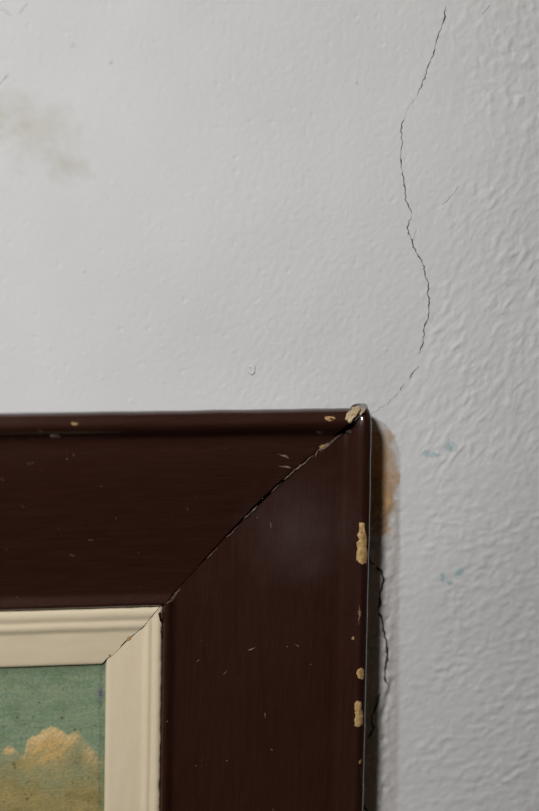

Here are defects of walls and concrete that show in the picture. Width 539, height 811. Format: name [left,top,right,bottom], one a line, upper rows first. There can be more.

crack [417,7,446,95]
crack [400,119,430,391]
crack [366,557,389,739]